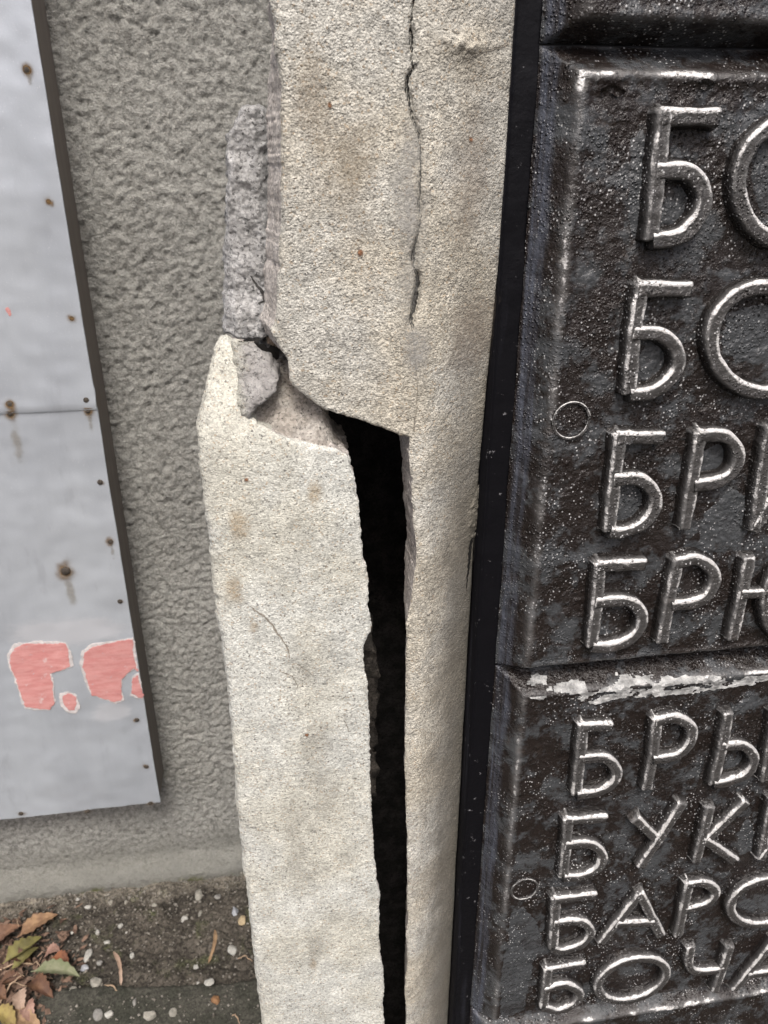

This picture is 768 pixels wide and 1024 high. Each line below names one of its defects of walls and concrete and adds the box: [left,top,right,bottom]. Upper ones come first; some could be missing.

spalling [221,2,349,449]
crack [272,428,353,471]
crack [344,0,422,913]
crack [380,835,408,1022]